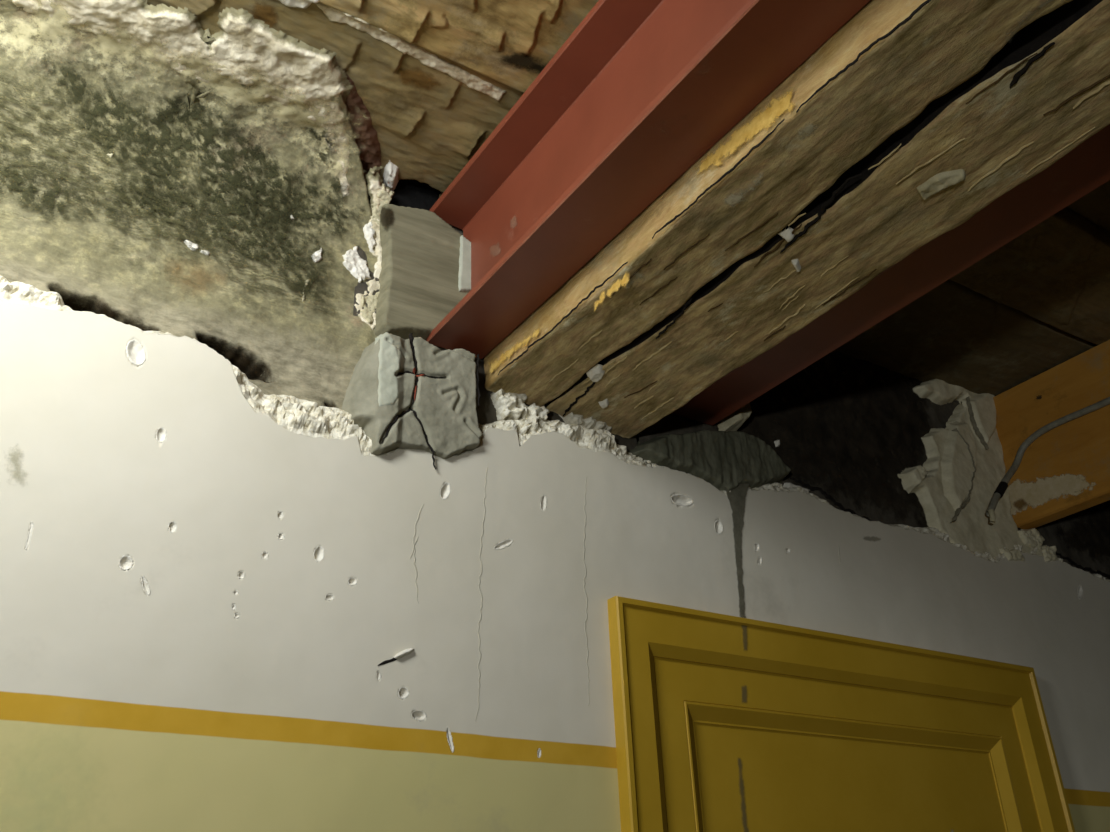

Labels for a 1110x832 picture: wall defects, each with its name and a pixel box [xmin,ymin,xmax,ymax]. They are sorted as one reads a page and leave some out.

damp [0,59,349,311]
flaking render [0,0,423,456]
crack [381,333,446,470]
crack [474,354,482,406]
flaking render [454,357,731,496]
flaking render [917,398,960,429]
flaking render [748,440,1110,582]